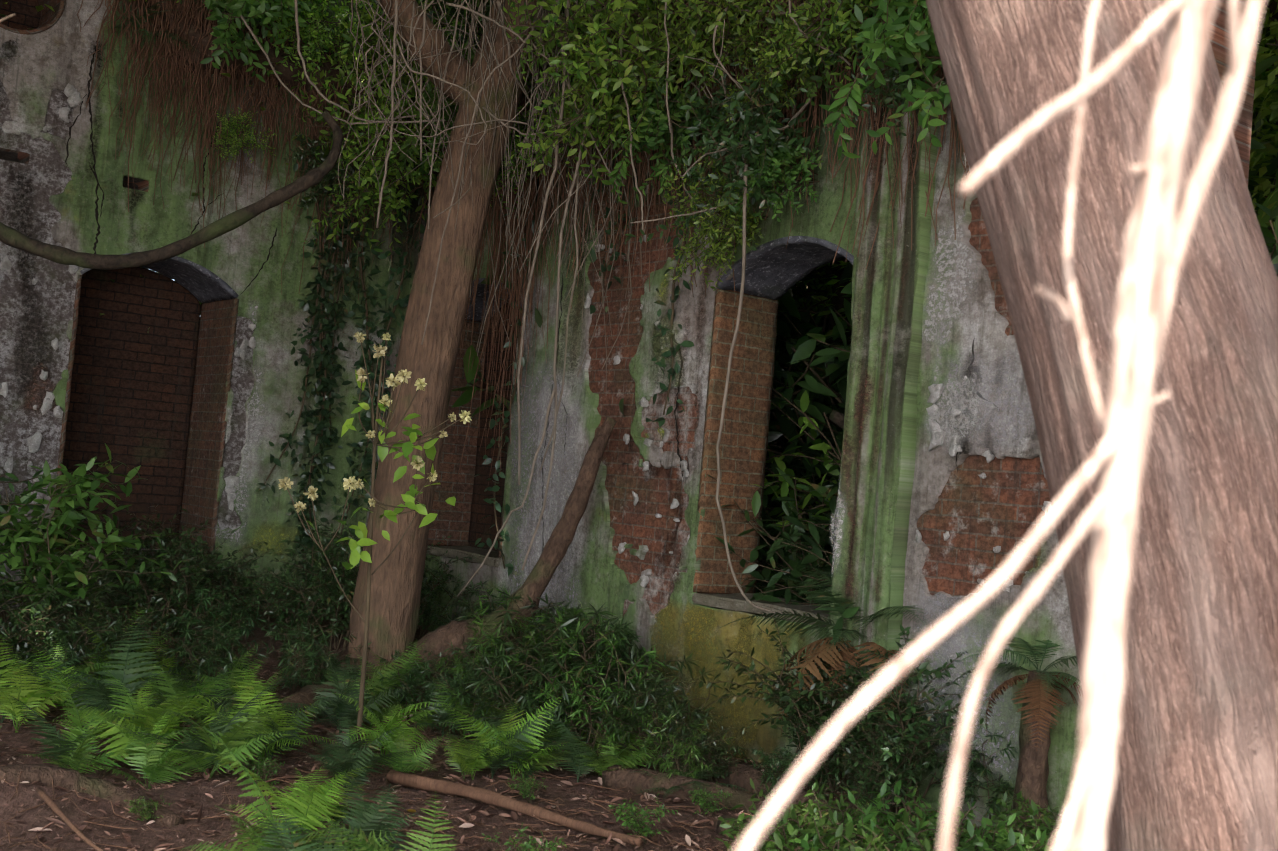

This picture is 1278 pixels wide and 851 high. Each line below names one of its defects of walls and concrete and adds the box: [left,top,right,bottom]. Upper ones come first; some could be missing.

water stain [869,77,915,196]
spalling [0,81,83,514]
flaking render [584,181,699,618]
water stain [831,361,882,599]
flaking render [915,450,1051,596]
flaking render [968,198,1014,336]